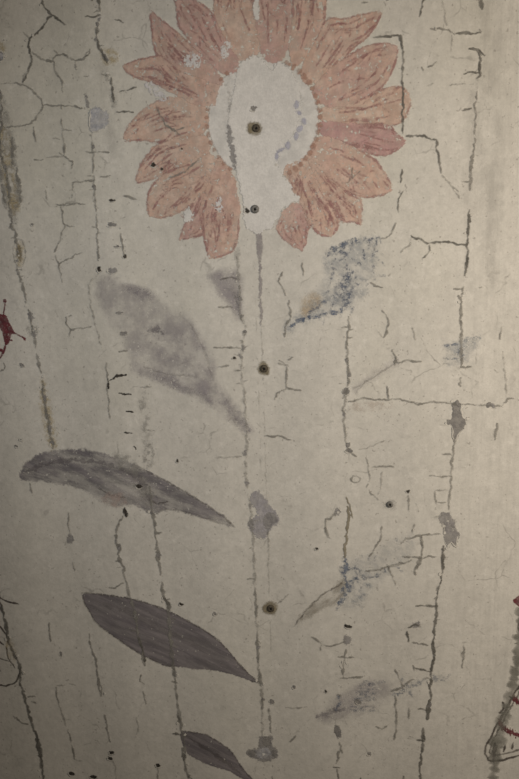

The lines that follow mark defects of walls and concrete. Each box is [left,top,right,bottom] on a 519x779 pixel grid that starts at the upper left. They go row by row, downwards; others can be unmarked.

crack [0,0,136,448]
peeling [226,54,303,234]
crack [379,34,442,171]
crack [420,0,484,191]
crack [339,170,513,495]
crack [0,598,45,779]
crack [109,516,146,701]
crack [147,487,192,779]
crack [325,497,353,558]
crack [368,525,445,779]
crack [436,438,456,507]
crack [489,608,519,779]